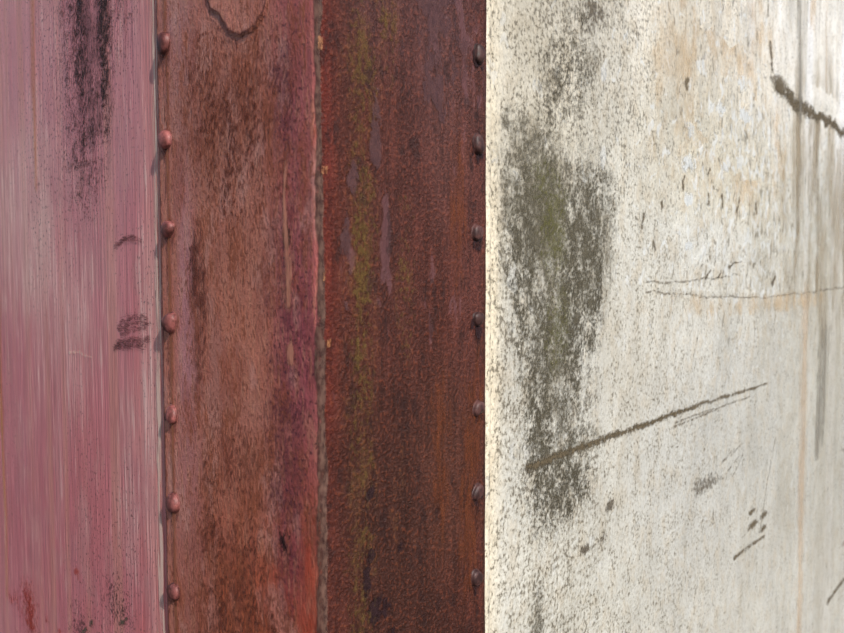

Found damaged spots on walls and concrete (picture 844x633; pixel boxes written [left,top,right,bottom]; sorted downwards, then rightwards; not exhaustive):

crack [207,0,269,38]
water stain [57,0,137,221]
rust [180,26,290,227]
rust [159,137,175,316]
rust [189,229,207,390]
rust [470,319,482,339]
water stain [509,243,529,327]
water stain [565,238,604,380]
crack [644,276,844,299]
rust [164,411,177,499]
rust [185,418,291,633]
water stain [526,351,589,525]